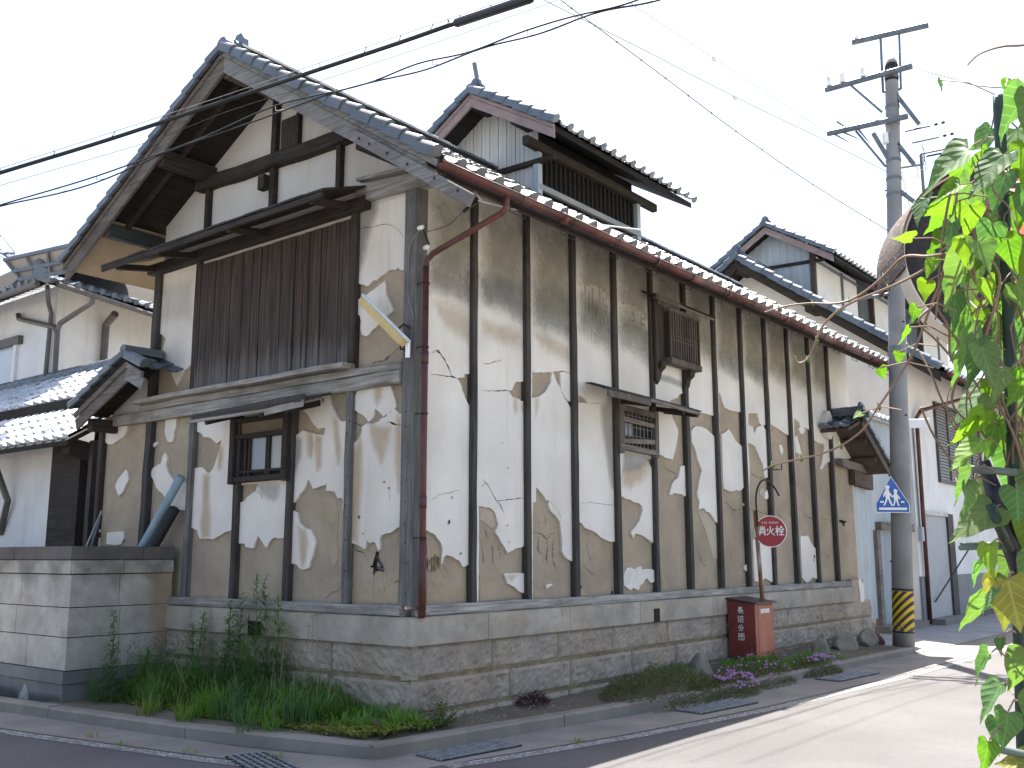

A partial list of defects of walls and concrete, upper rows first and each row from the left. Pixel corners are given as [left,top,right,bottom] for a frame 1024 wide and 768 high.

spalling [358,269,404,368]
damp [433,209,470,285]
damp [486,220,523,304]
damp [537,232,569,316]
damp [582,245,677,336]
damp [692,289,786,378]
spalling [322,385,402,441]
spalling [100,417,399,605]
crack [482,479,520,568]
spalling [412,394,865,609]